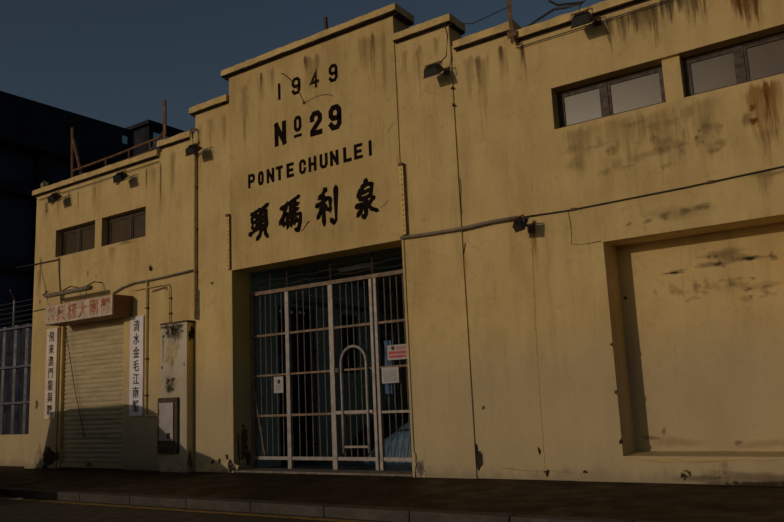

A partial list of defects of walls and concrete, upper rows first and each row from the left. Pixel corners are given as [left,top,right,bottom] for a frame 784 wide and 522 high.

corrosion [749,82,776,124]
spalling [42,446,59,468]
spalling [475,443,483,471]